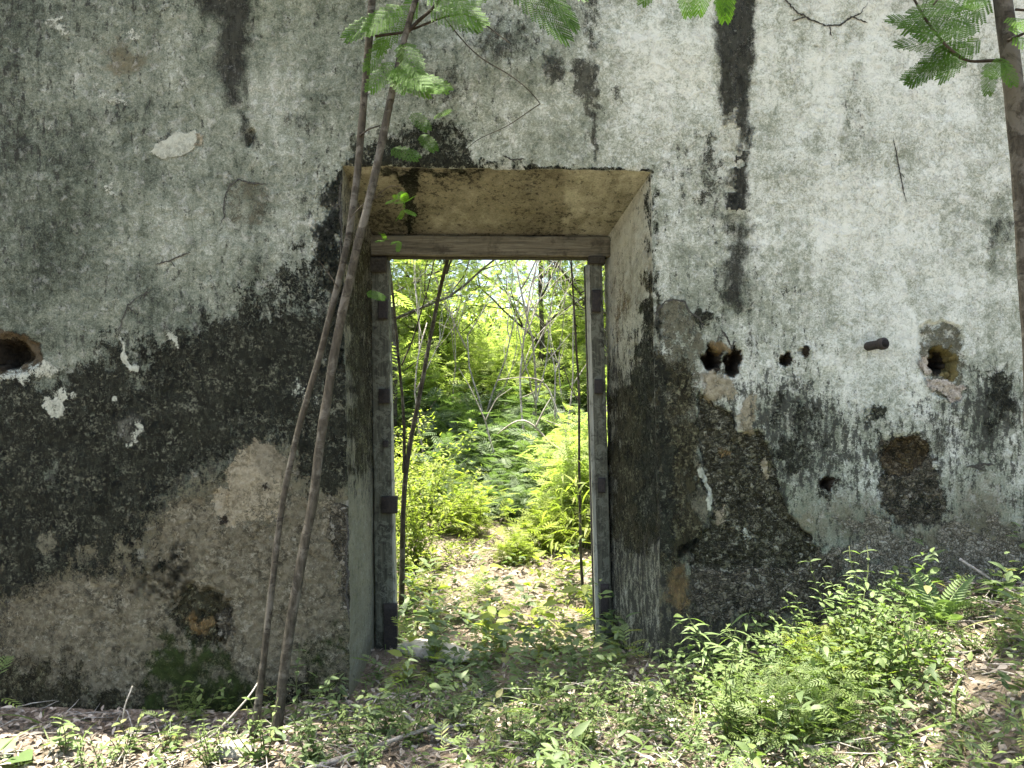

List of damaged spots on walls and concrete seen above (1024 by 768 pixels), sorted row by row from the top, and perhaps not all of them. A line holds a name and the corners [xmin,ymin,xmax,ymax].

water stain [196,0,257,147]
peeling [150,130,204,159]
water stain [692,0,757,312]
spalling [0,328,59,387]
peeling [42,386,76,419]
water stain [130,330,202,406]
water stain [272,370,348,501]
water stain [691,308,726,332]
spalling [918,322,967,403]
water stain [0,468,155,577]
spalling [680,340,1024,627]